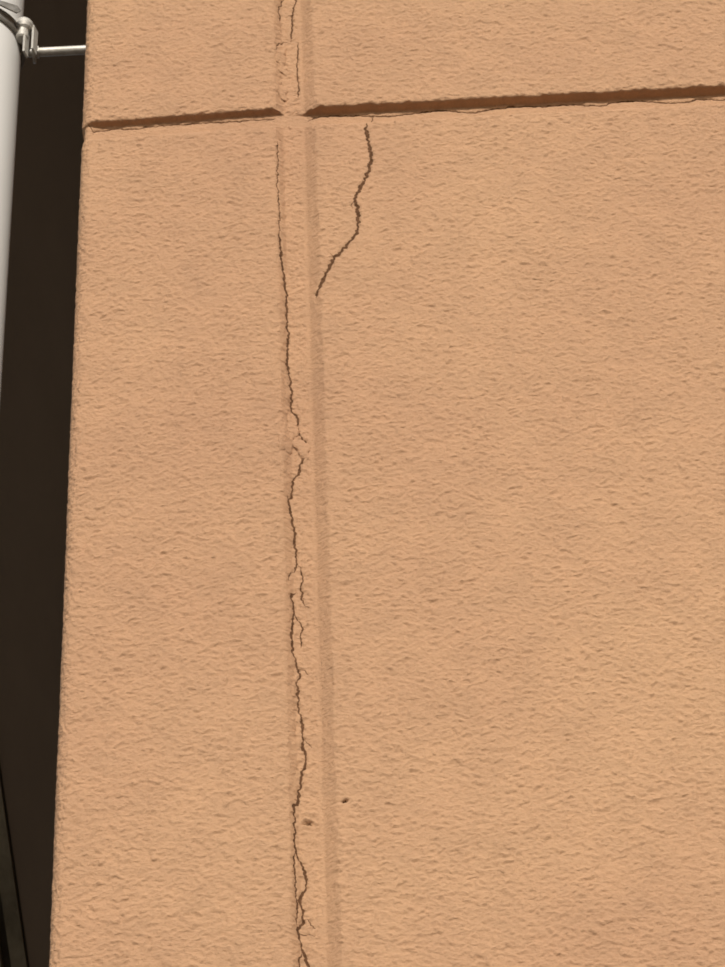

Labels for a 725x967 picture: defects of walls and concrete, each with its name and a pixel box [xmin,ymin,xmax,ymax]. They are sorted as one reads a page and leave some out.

crack [90,119,315,967]
crack [309,99,725,297]